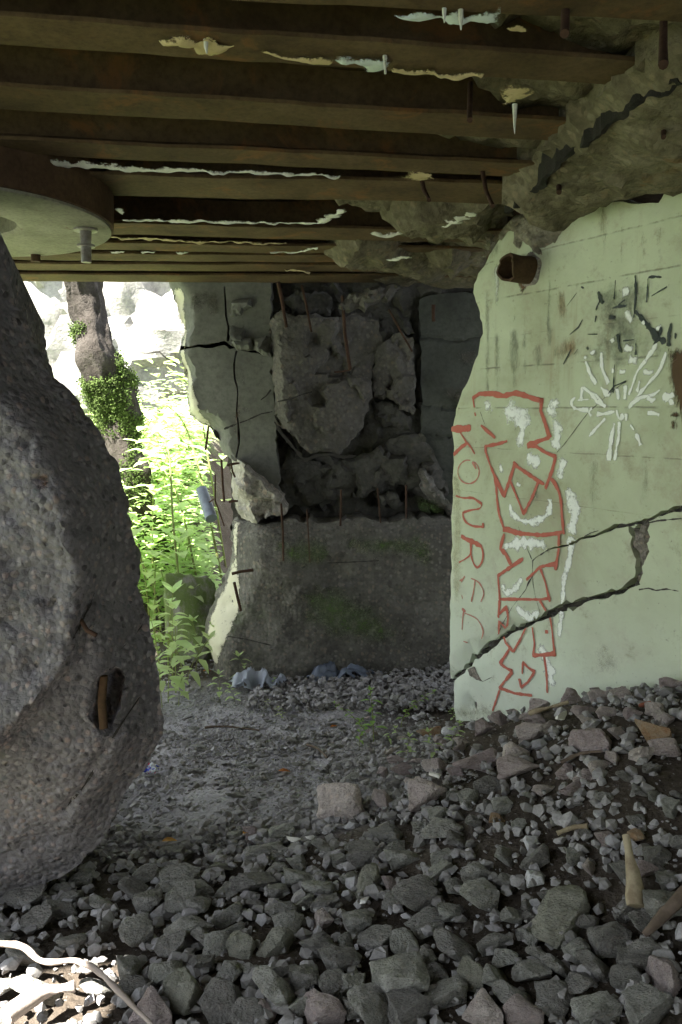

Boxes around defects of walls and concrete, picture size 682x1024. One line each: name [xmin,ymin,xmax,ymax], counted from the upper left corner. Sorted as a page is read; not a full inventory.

water stain [159,37,234,56]
spalling [481,13,682,55]
water stain [262,51,484,81]
spalling [472,76,594,111]
crack [504,78,682,214]
water stain [51,160,340,180]
water stain [116,208,347,225]
spalling [335,199,392,212]
spalling [351,204,562,289]
crack [139,294,356,463]
crack [452,506,682,682]